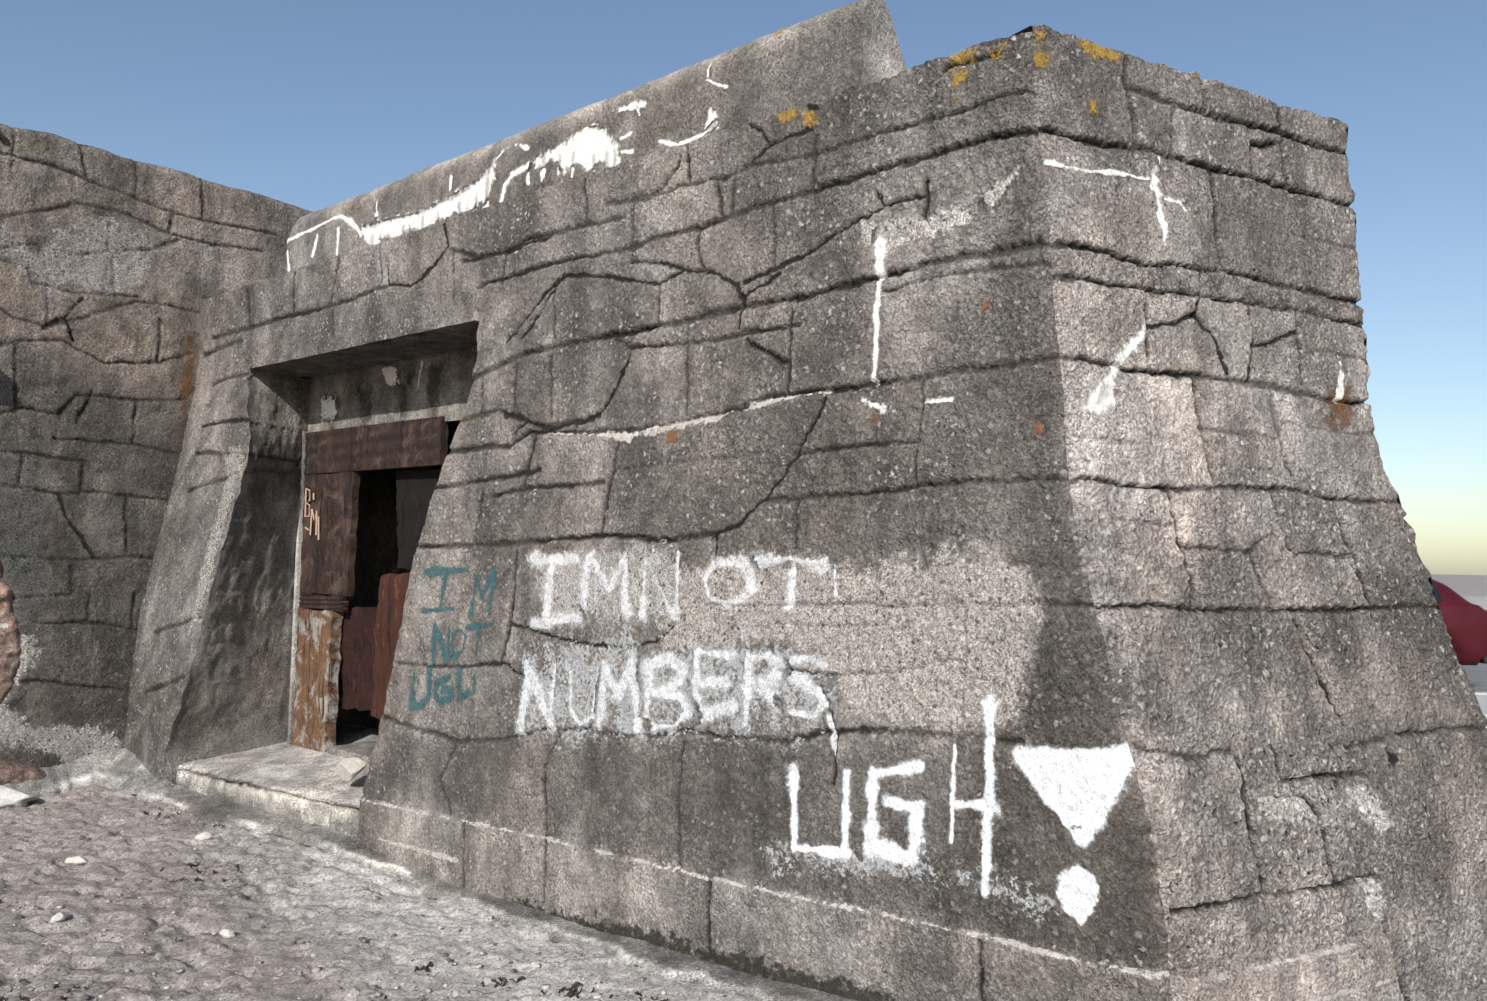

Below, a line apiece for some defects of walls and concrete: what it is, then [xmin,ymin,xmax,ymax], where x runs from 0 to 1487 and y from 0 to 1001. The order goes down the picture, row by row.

crack [0,132,11,147]
crack [749,123,812,161]
crack [388,223,449,287]
crack [41,297,84,342]
crack [1146,298,1296,384]
crack [504,194,925,573]
rust [1325,385,1352,429]
crack [56,492,94,558]
crack [1228,748,1250,840]